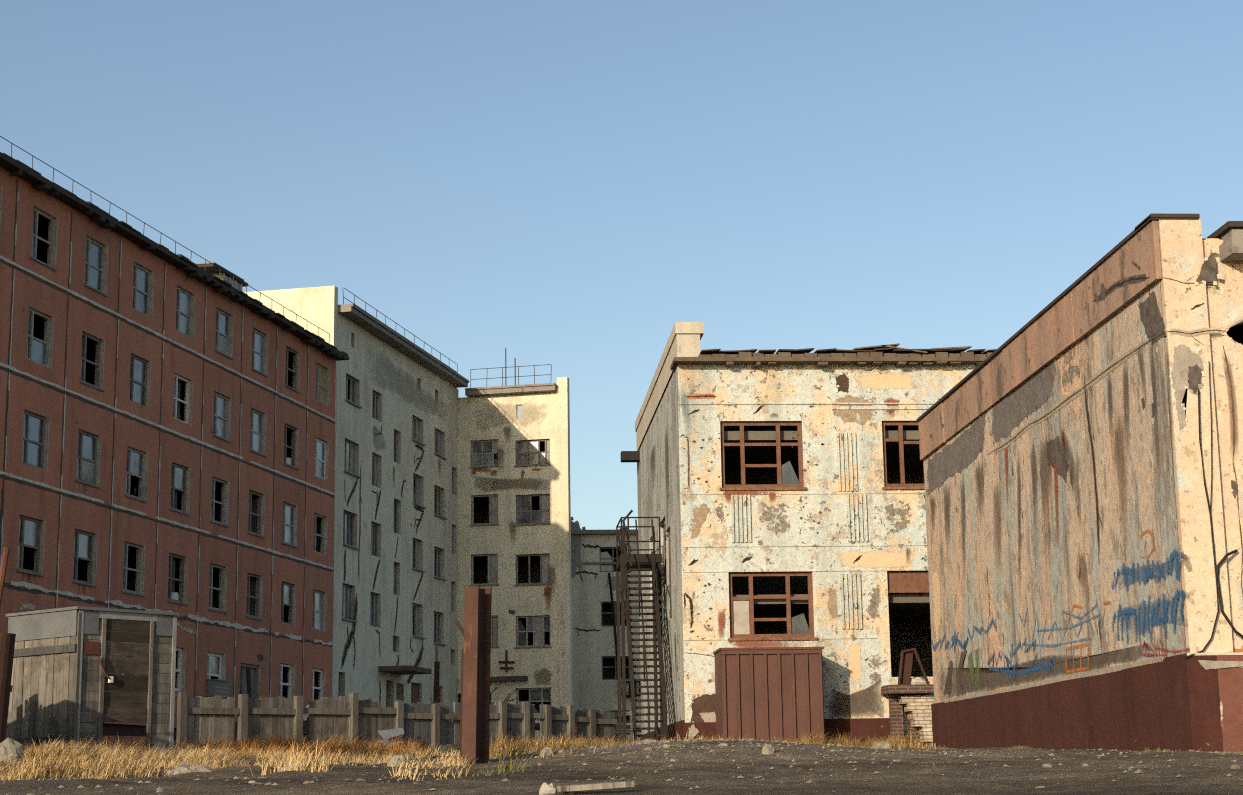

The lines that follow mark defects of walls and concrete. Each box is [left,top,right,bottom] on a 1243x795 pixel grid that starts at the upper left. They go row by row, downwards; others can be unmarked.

damp [1108,352,1171,426]
crack [990,274,1243,595]
peeling [688,438,728,541]
peeling [754,492,822,538]
peeling [821,347,1080,629]
damp [931,468,983,547]
damp [1017,439,1079,539]
damp [932,565,941,642]
peeling [848,643,886,687]
peeling [1198,648,1243,670]